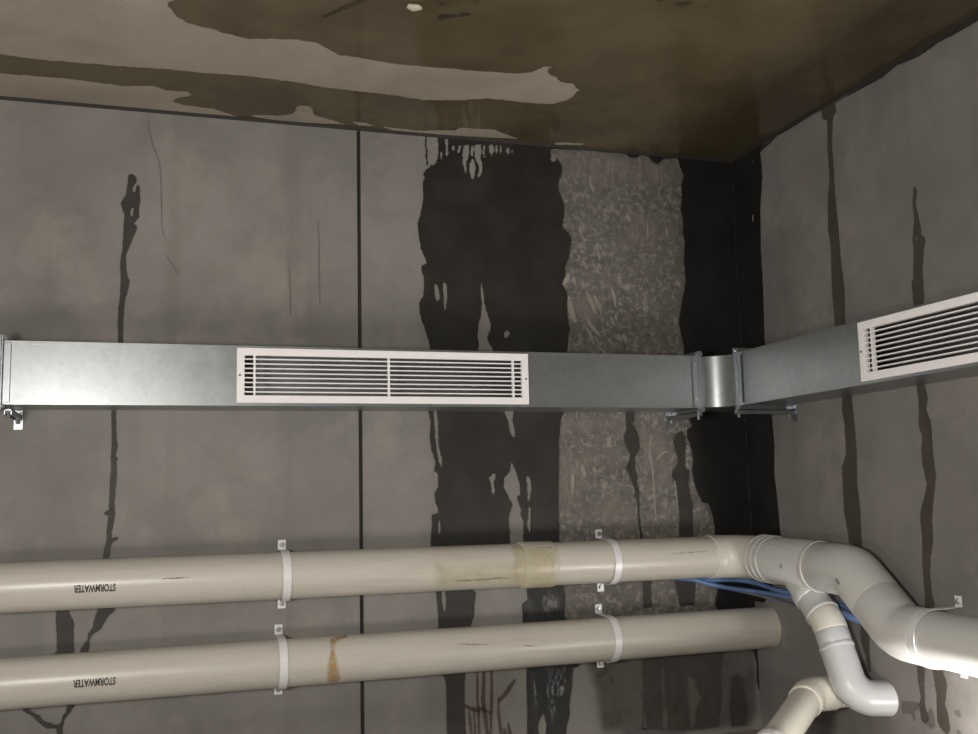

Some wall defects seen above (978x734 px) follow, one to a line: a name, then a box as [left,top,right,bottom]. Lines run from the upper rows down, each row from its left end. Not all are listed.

leakage [118,174,141,343]
leakage [417,122,800,357]
leakage [820,16,978,327]
leakage [103,410,118,559]
leakage [428,411,780,547]
leakage [842,396,862,548]
leakage [917,384,936,608]
leakage [23,705,75,734]
leakage [54,608,115,654]
leakage [442,673,466,734]
leakage [436,590,476,629]
leakage [917,665,950,734]